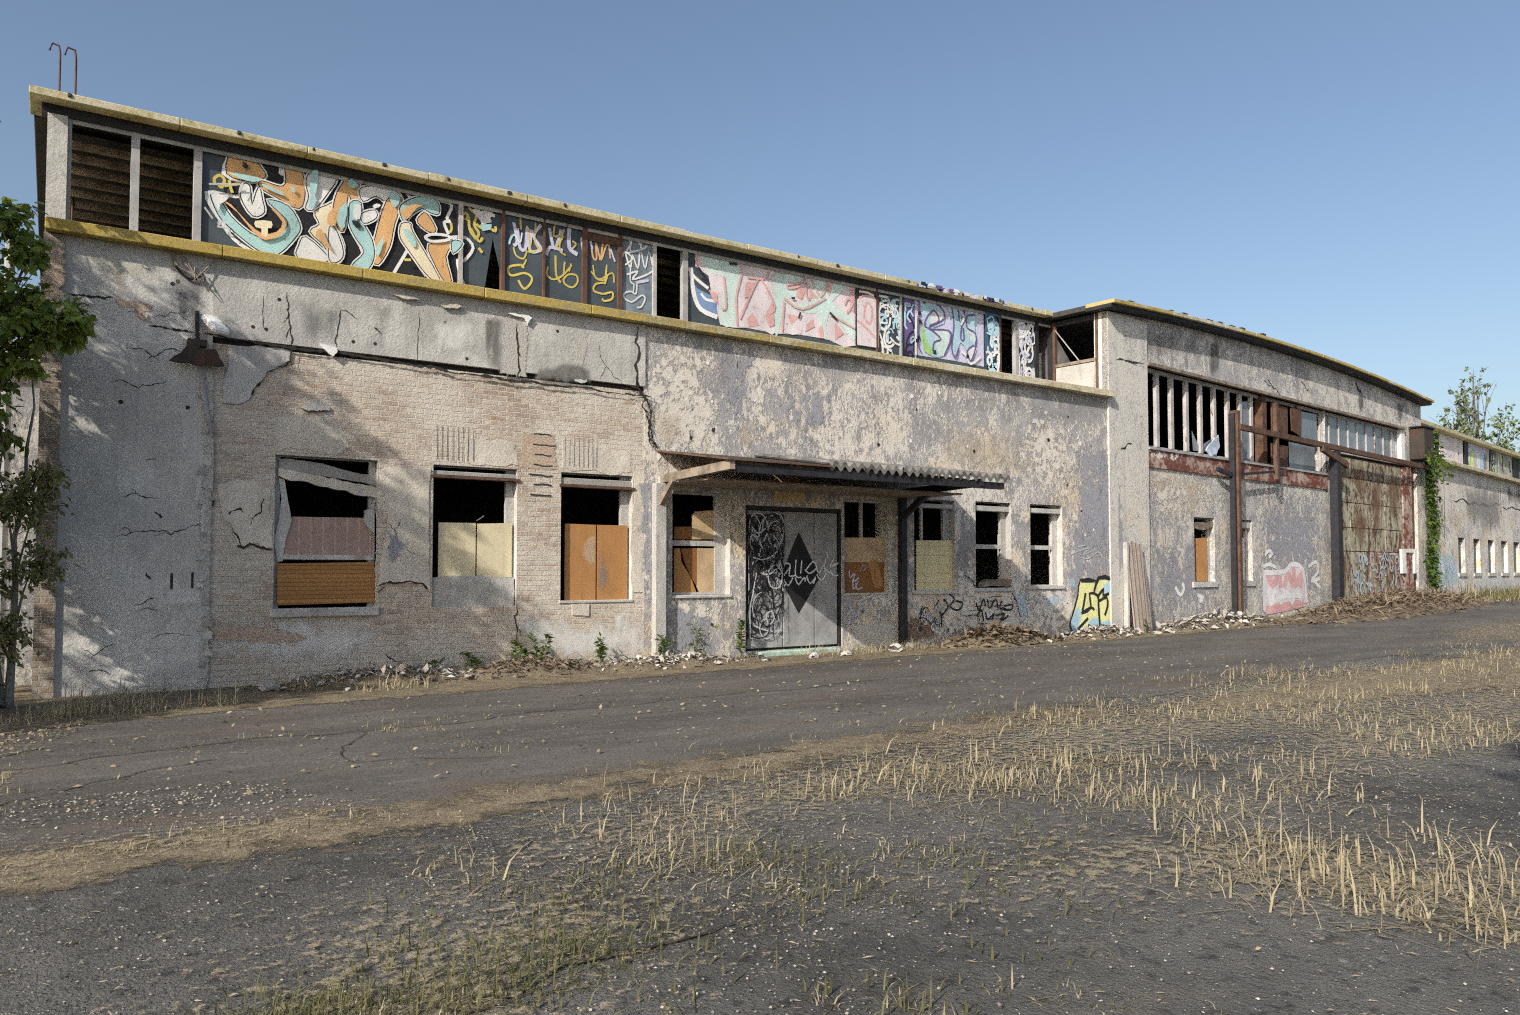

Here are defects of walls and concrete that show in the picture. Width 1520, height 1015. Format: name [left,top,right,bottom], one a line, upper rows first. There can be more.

crack [66,293,113,305]
crack [113,295,658,449]
spalling [209,621,306,646]